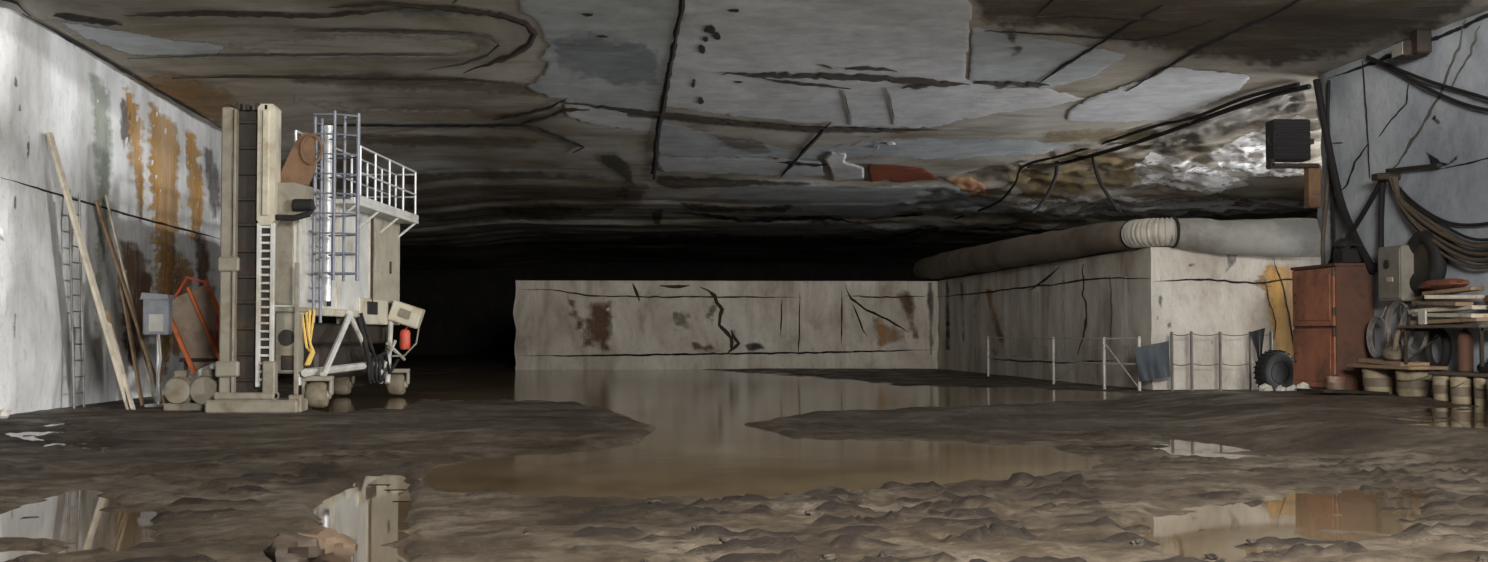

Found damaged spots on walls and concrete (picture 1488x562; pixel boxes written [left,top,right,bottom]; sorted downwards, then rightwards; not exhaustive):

crack [2,0,1301,180]
spalling [519,0,1310,232]
crack [1327,13,1488,190]
crack [1,177,219,239]
corrosion [120,93,203,382]
crack [674,212,1066,244]
corrosion [868,165,987,197]
damp [569,300,611,350]
crack [523,260,1293,364]
corrosion [1256,265,1294,357]